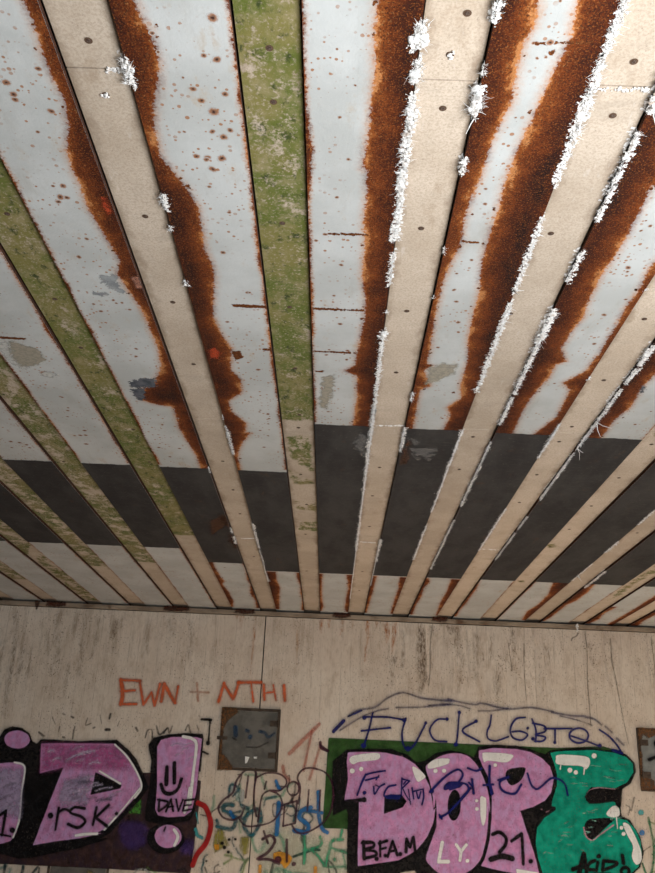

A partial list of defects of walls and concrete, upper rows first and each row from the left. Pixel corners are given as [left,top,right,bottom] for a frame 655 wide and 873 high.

rust [0,0,208,469]
rust [109,0,287,471]
rust [302,0,425,427]
water stain [350,327,409,598]
water stain [385,18,434,287]
water stain [461,61,490,133]
water stain [474,212,546,393]
rust [405,0,621,431]
water stain [496,304,561,426]
rust [496,105,655,438]
water stain [552,0,655,189]
water stain [591,127,647,223]